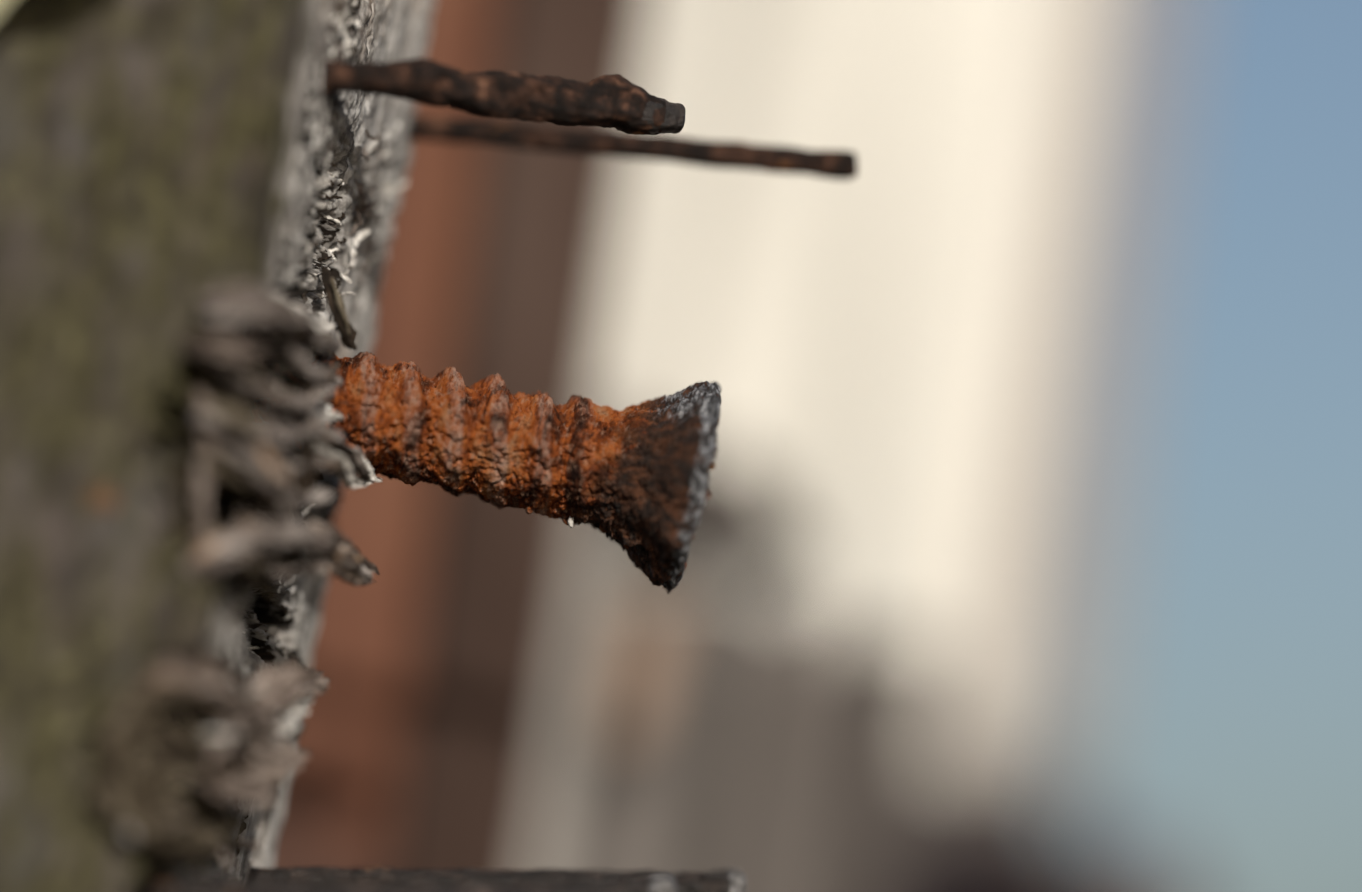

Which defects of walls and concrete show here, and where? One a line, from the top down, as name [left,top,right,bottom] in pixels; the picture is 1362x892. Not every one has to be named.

peeling [242,614,305,667]